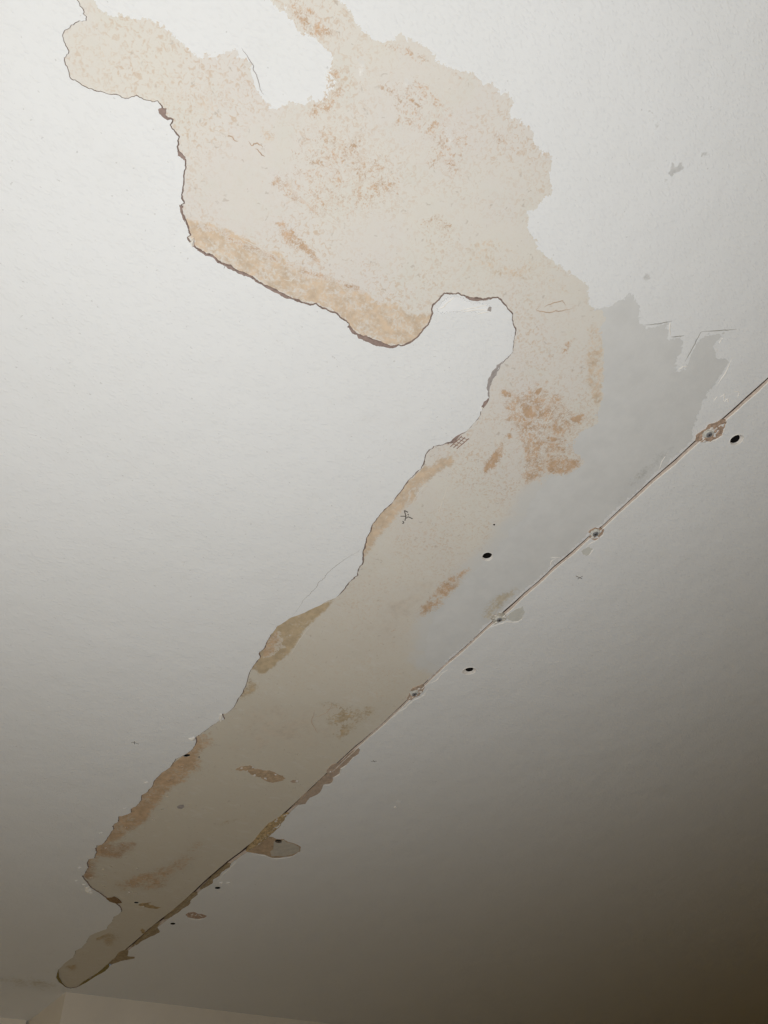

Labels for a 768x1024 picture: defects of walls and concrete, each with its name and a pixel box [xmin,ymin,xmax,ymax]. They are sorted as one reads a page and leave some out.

water stain [186,214,431,345]
water stain [84,731,216,880]
water stain [240,598,335,700]
peeling [56,0,606,988]
crack [111,378,768,965]
peeling [424,293,731,667]